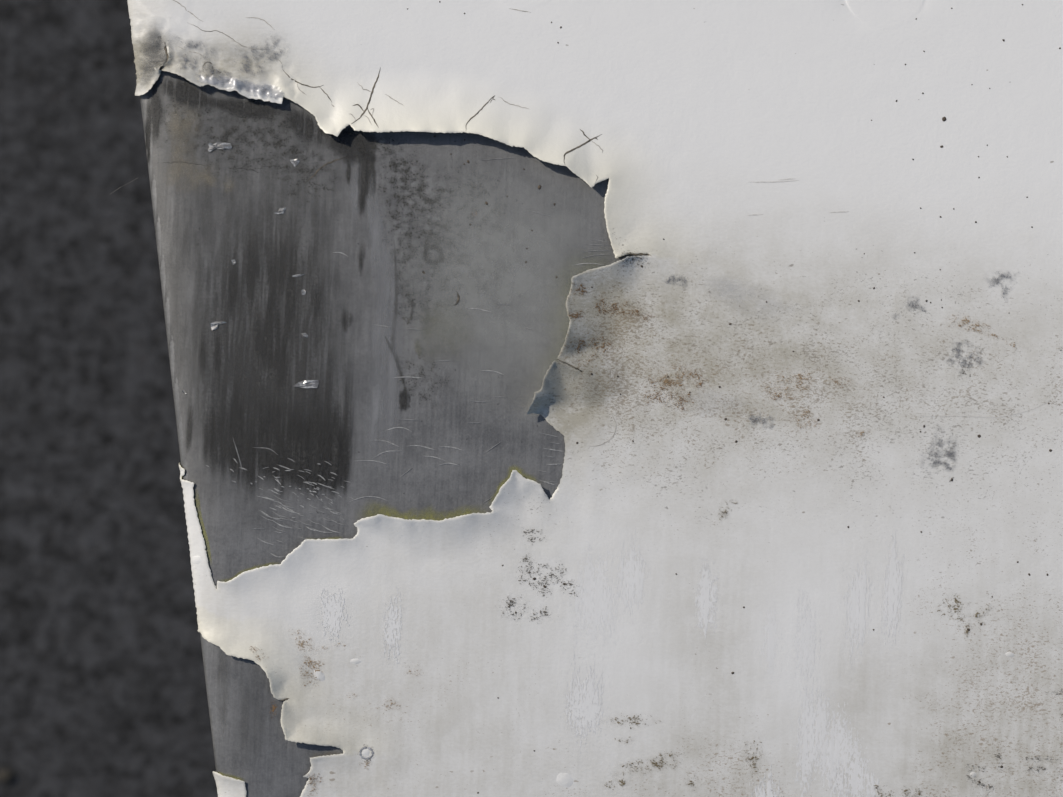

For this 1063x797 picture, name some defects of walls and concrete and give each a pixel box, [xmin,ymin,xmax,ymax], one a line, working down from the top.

peeling [134,17,714,797]
damp [756,589,879,797]